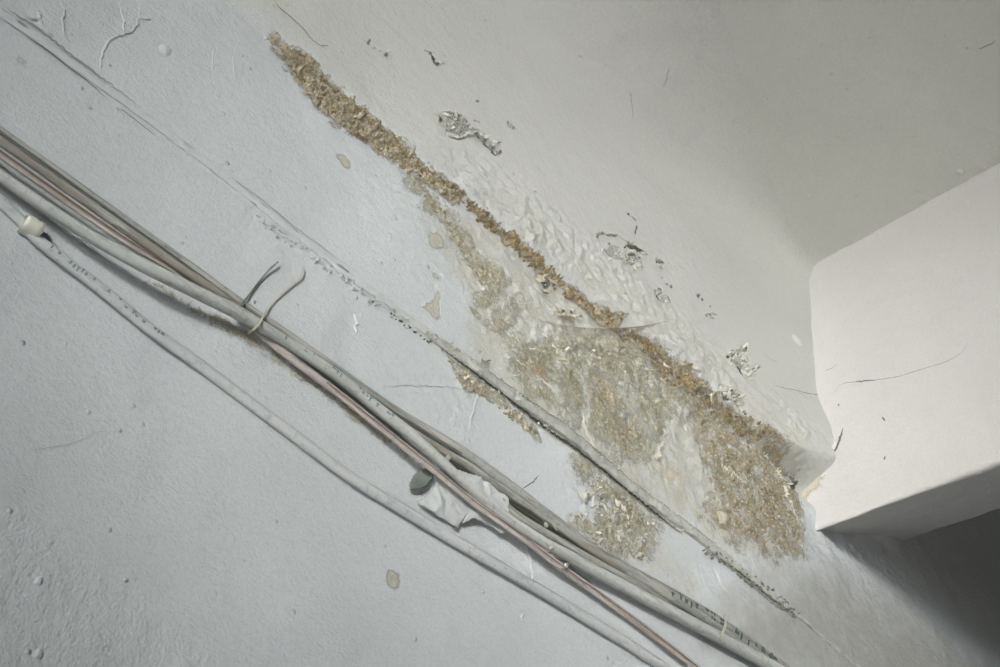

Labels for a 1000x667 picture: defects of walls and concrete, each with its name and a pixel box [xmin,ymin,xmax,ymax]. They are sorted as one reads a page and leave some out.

crack [27,36,156,136]
peeling [439,109,502,156]
peeling [596,213,664,270]
peeling [534,277,558,295]
damp [447,357,540,438]
spalling [504,331,712,467]
peeling [718,383,747,408]
peeling [723,342,761,380]
crack [778,350,964,397]
spalling [570,451,662,560]
damp [689,400,819,563]
peeling [781,476,803,516]